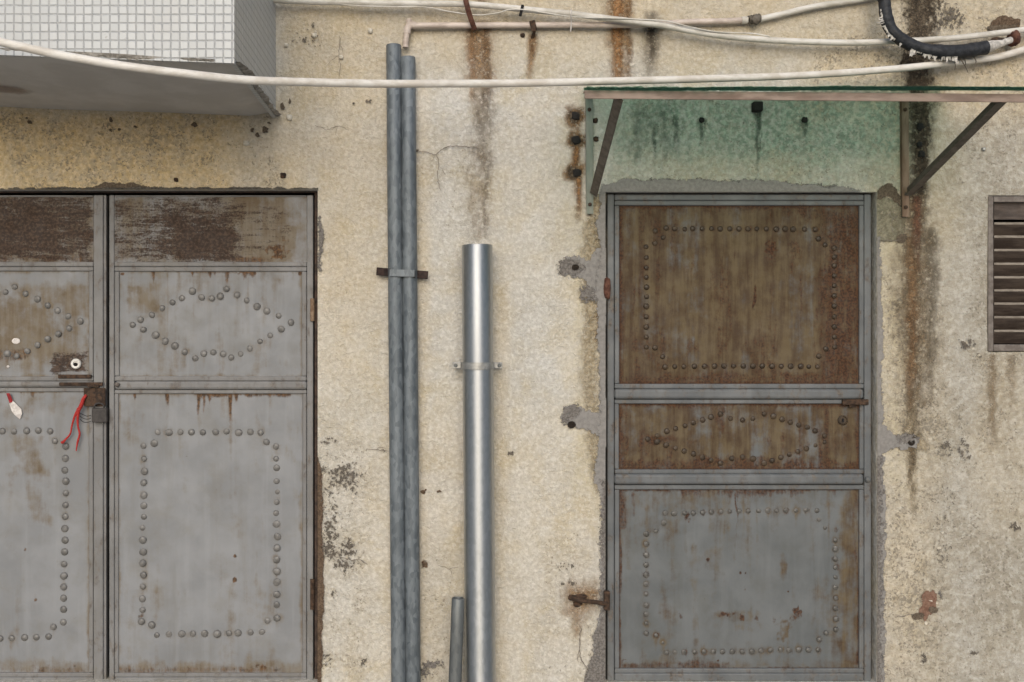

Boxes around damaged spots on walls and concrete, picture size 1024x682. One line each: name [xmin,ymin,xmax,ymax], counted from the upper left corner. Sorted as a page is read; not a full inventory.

rust [469,28,491,80]
rust [610,0,632,77]
damp [903,0,970,38]
crack [416,145,479,190]
rust [563,108,586,202]
rust [896,194,938,498]
flaking render [556,177,861,682]
peeling [318,462,367,573]
flaking render [897,590,942,625]